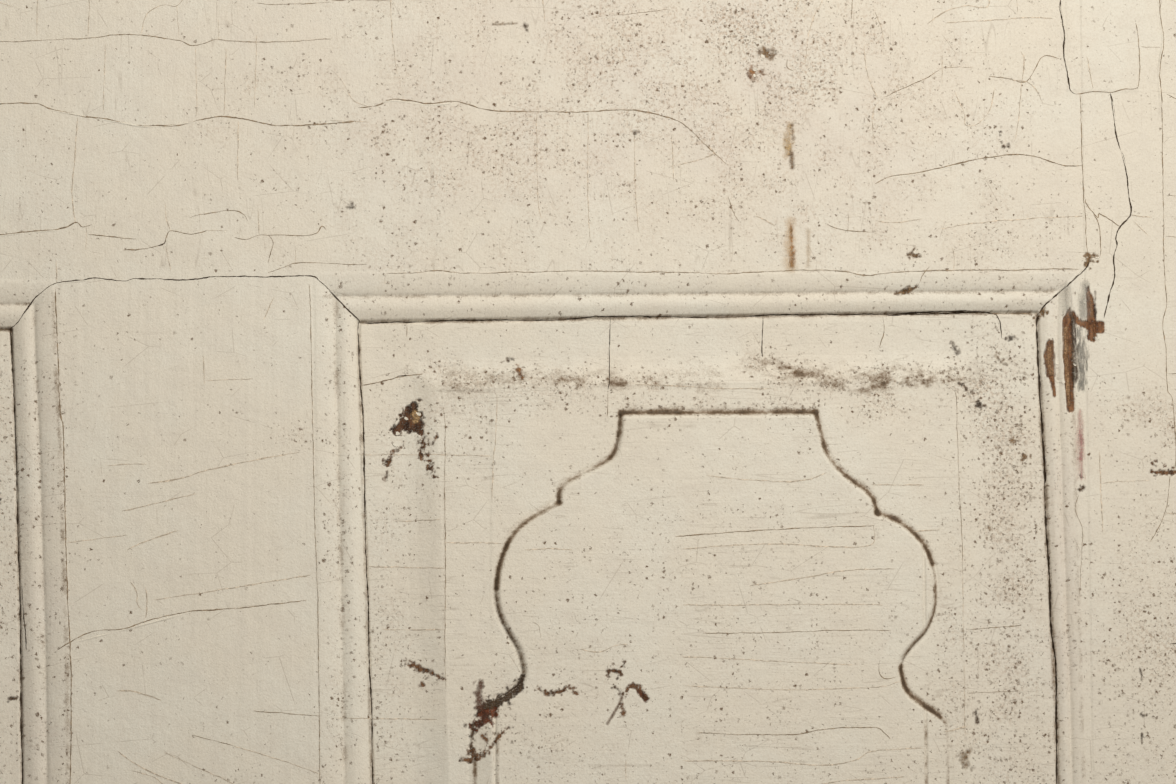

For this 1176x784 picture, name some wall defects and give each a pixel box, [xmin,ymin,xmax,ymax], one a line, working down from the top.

crack [0,0,725,329]
crack [603,0,1176,595]
crack [675,525,897,690]